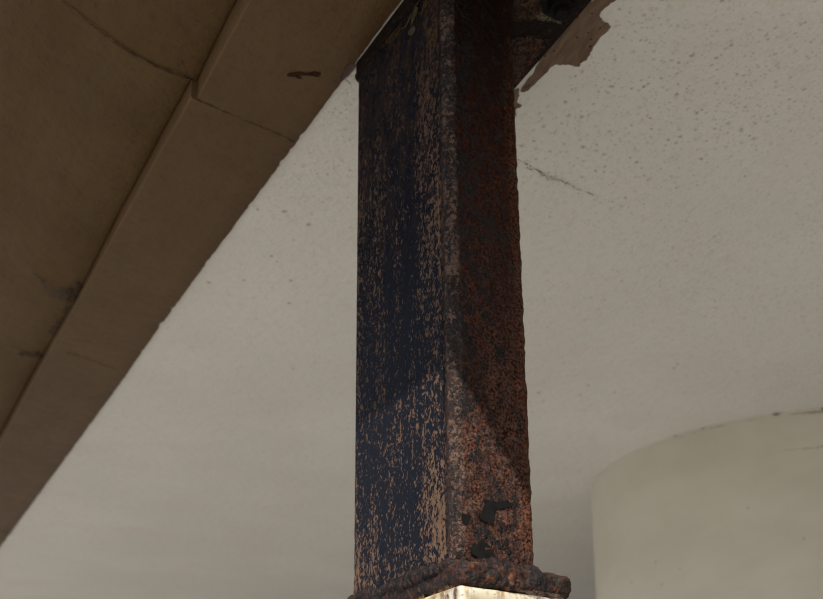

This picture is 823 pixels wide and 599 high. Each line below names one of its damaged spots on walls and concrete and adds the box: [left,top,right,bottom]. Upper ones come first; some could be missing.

crack [518,159,606,200]